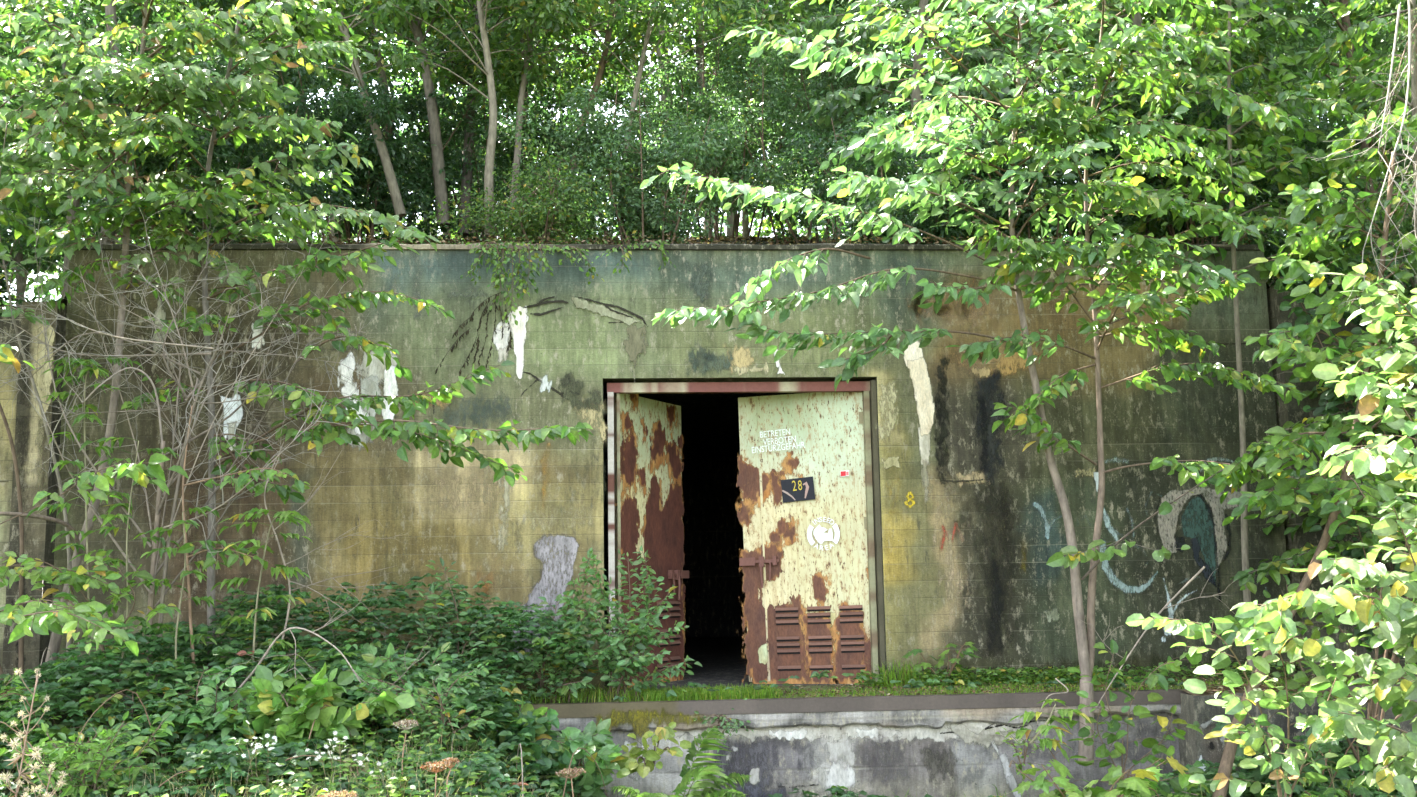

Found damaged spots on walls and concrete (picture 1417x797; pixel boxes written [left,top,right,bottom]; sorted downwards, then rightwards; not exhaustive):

corrosion [615,394,686,689]
corrosion [735,450,872,684]
water stain [904,341,950,502]
water stain [971,371,1017,657]